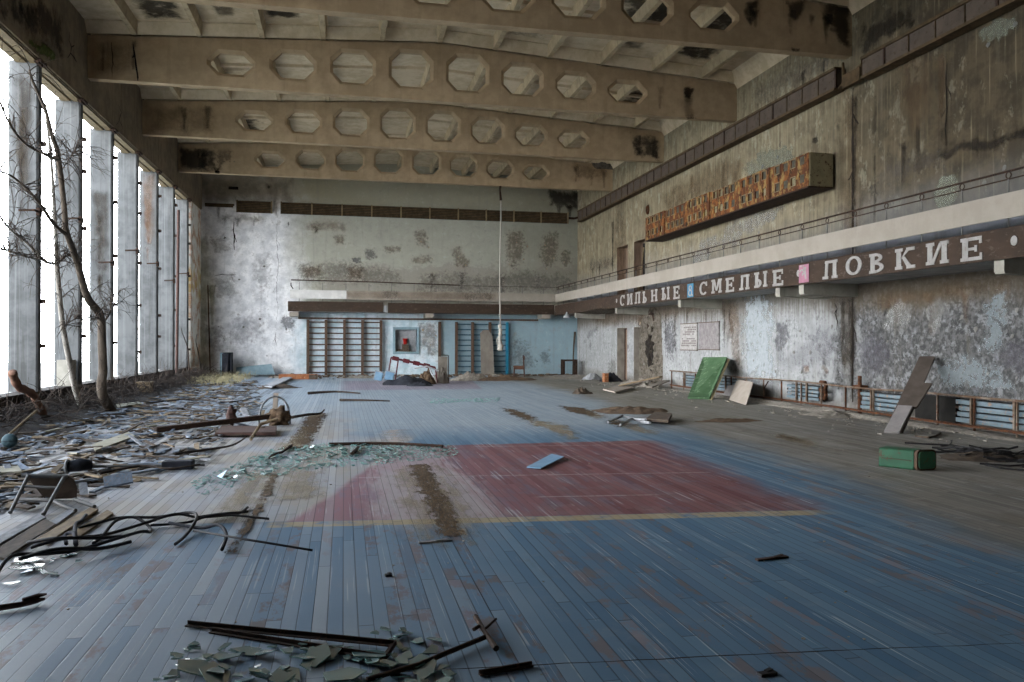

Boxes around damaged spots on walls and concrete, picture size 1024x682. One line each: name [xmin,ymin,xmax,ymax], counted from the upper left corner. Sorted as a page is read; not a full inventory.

water stain [136,0,180,18]
crack [111,42,139,81]
water stain [180,148,218,171]
water stain [633,136,659,158]
water stain [941,128,1024,159]
water stain [548,190,578,210]
spalling [639,322,676,371]
peeling [735,294,801,383]
peeling [937,291,1019,396]